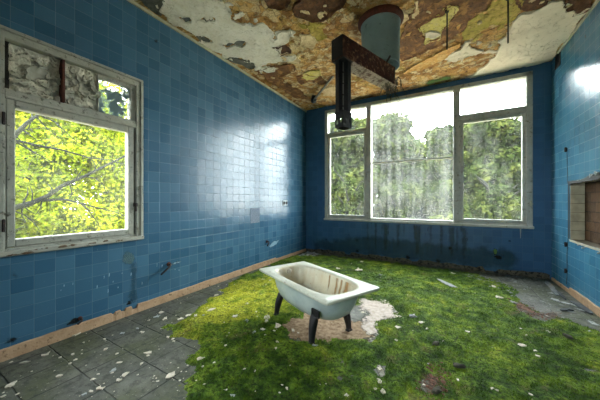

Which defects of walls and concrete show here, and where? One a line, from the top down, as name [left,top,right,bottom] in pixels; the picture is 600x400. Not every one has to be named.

peeling [140,0,347,99]
corrosion [344,36,394,82]
peeling [399,0,592,78]